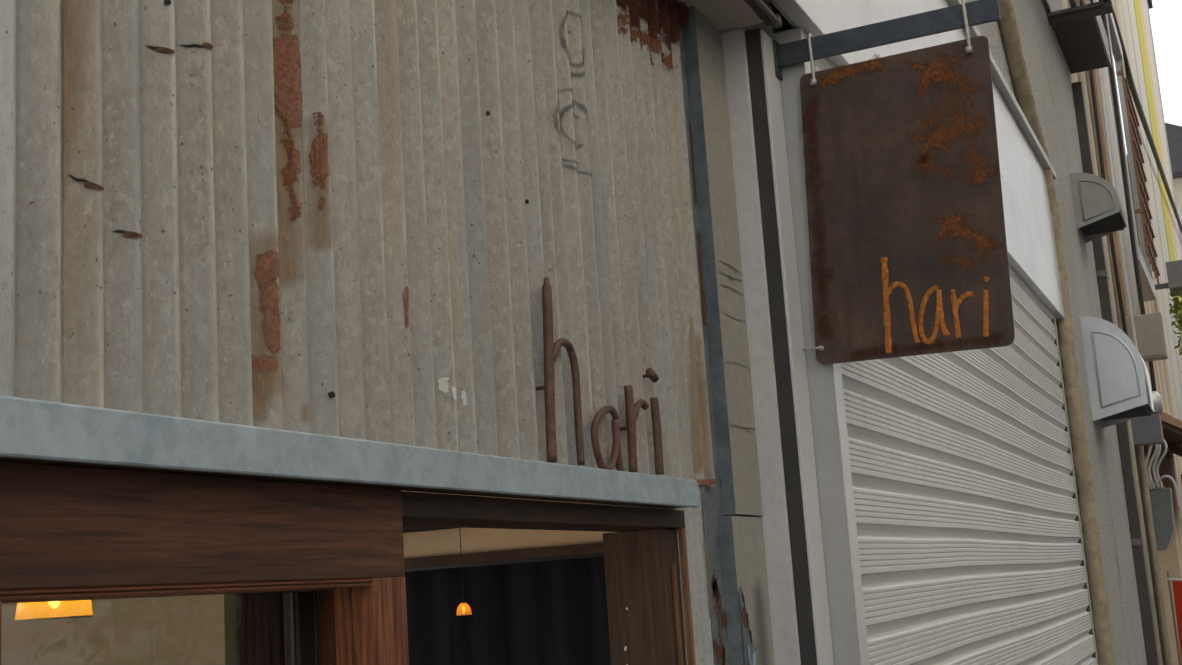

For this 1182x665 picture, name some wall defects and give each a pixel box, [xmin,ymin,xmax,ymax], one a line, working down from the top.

corrosion [252,0,329,415]
corrosion [616,0,689,70]